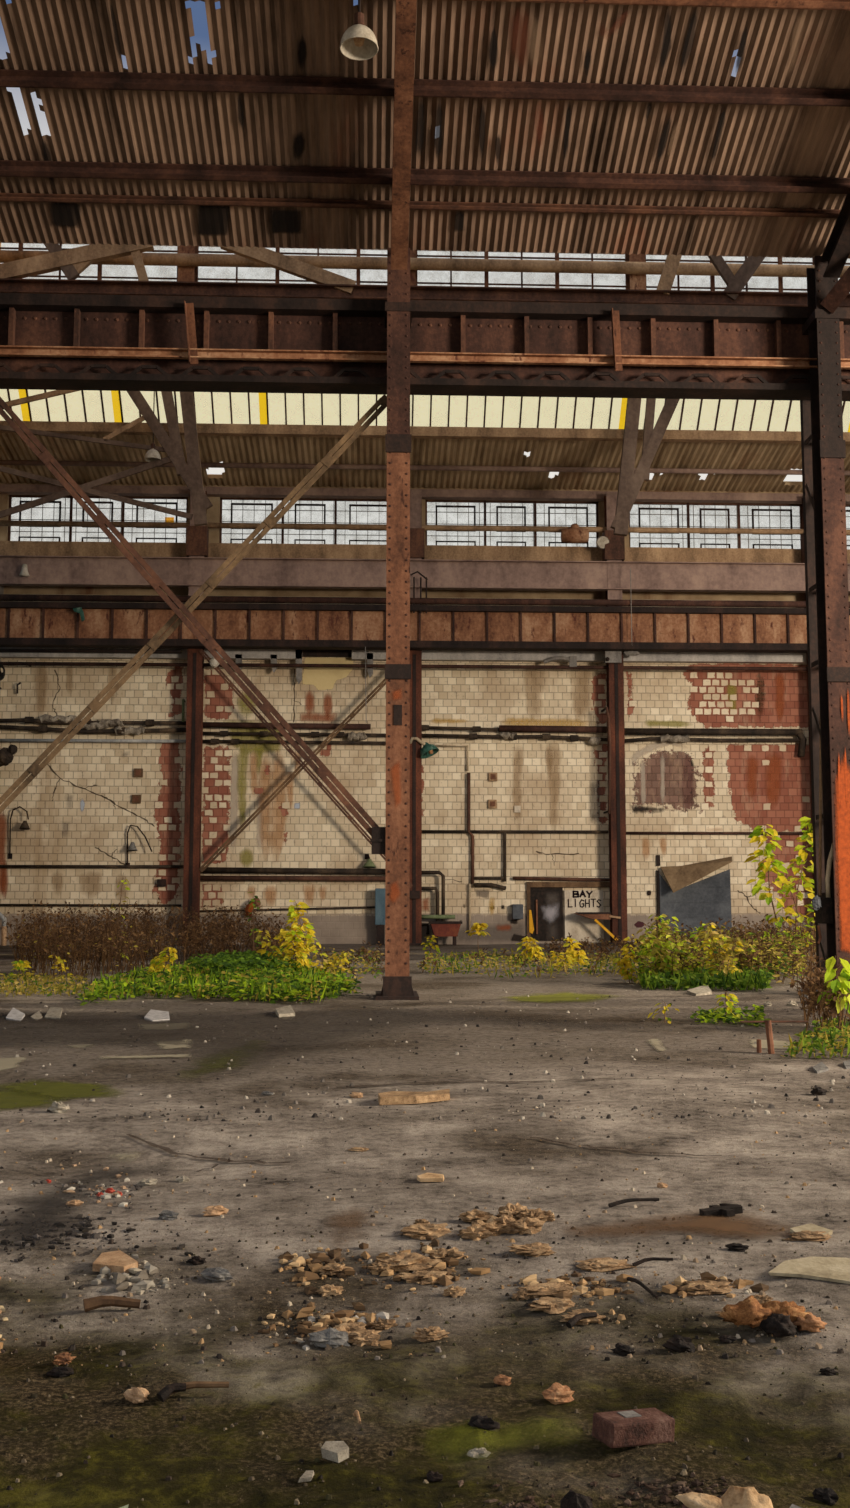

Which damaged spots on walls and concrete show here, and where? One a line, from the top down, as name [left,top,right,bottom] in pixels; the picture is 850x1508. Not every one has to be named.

peeling [165,666,183,717]
peeling [203,669,234,720]
rust [841,693,850,733]
crack [47,764,154,826]
peeling [152,743,183,904]
peeling [201,884,225,908]
peeling [201,745,232,864]
damp [230,751,263,865]
peeling [630,663,814,921]
rust [836,751,850,953]